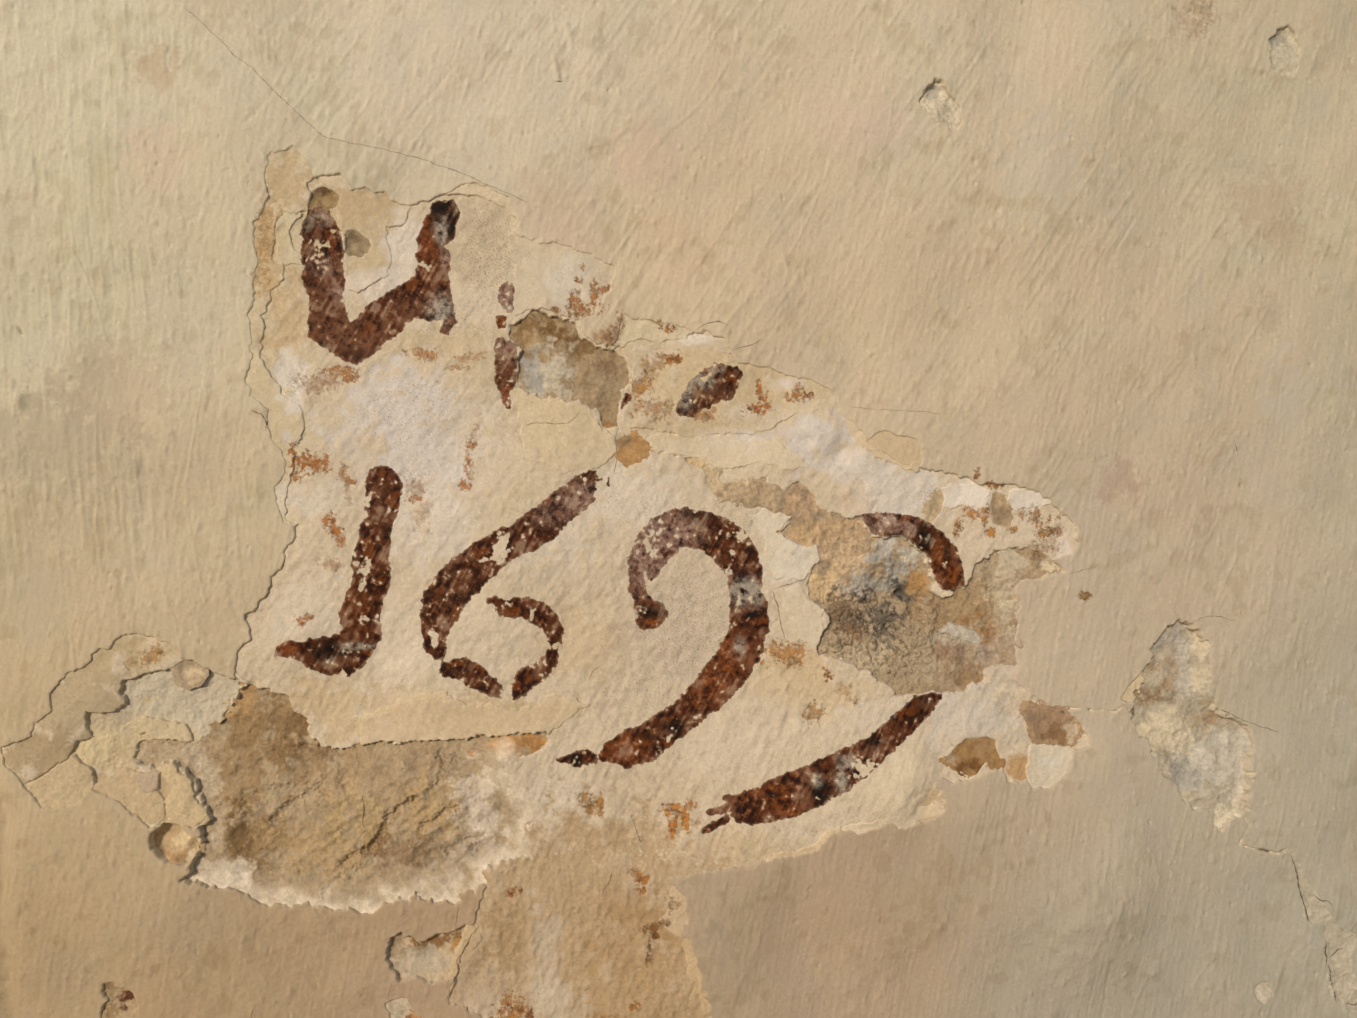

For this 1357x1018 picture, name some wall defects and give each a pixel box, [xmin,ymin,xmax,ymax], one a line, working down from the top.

peeling [919,82,961,129]
peeling [2,146,1088,1018]
spalling [1122,621,1251,831]
crack [1258,848,1357,1017]